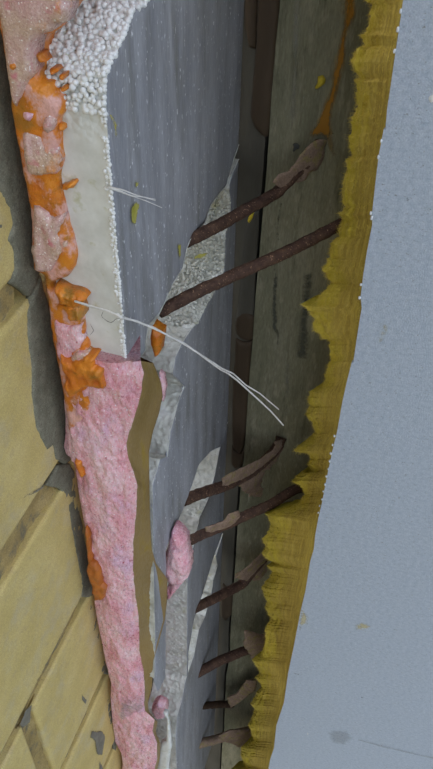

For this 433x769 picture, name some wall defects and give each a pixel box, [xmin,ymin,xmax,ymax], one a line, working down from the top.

rust [312,0,354,149]
spalling [141,298,209,551]
spalling [190,446,221,491]
spalling [201,534,223,599]
spalling [148,564,207,769]